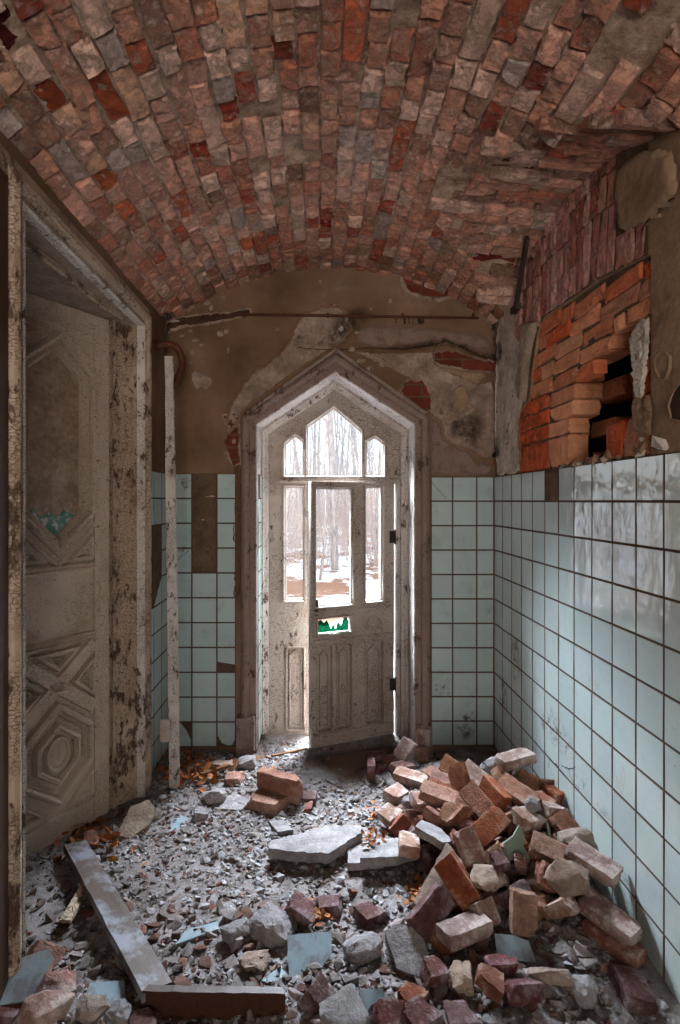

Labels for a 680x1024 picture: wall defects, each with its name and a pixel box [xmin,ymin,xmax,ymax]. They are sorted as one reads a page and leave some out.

peeling [193,473,216,571]
flaking render [222,143,680,597]